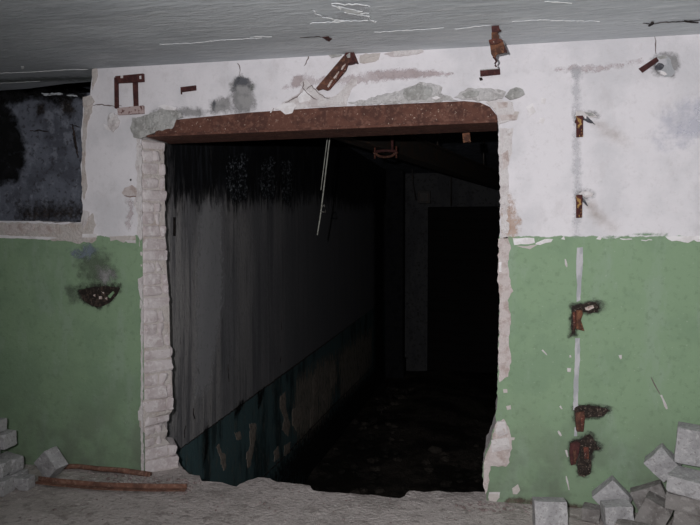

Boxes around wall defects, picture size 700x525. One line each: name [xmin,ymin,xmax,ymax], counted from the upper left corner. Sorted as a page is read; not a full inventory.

flaking render [359,49,424,64]
water stain [211,76,256,113]
peeling [275,79,358,114]
flaking render [486,99,565,393]
spalling [483,419,515,502]